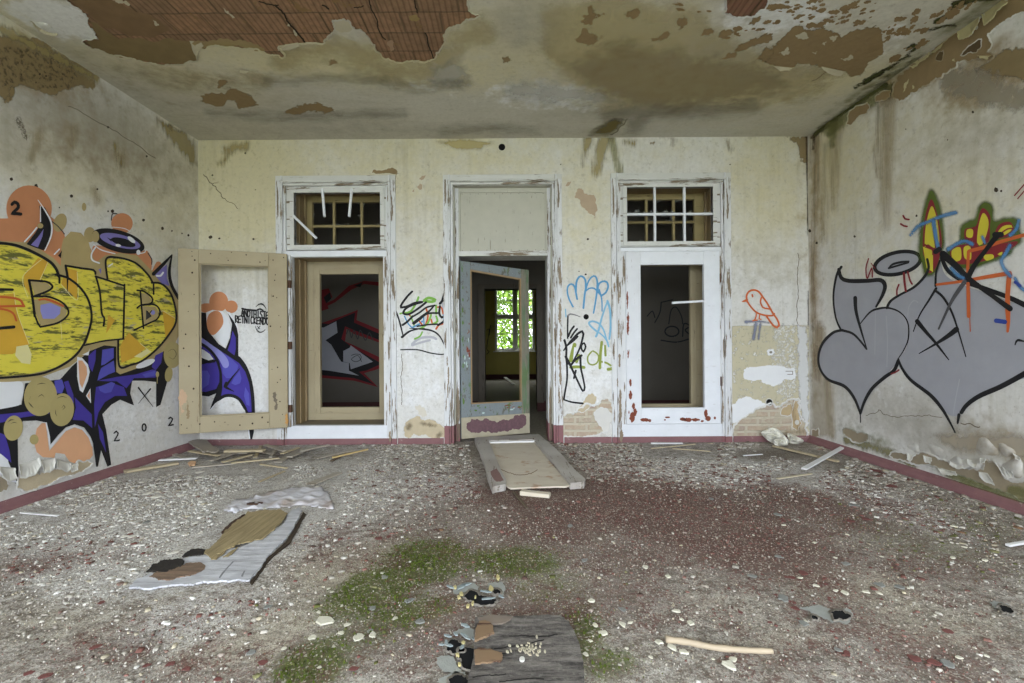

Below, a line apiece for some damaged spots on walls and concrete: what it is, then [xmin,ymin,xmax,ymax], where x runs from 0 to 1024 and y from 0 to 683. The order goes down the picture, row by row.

spalling [66,0,481,67]
leakage [928,0,993,31]
peeling [651,0,1024,126]
peeling [201,80,258,109]
leakage [790,43,921,163]
peeling [565,181,599,219]
peeling [613,282,629,339]
flaking render [554,302,651,443]
flaking render [664,324,820,438]
flaking render [389,404,444,441]
peeling [0,458,94,493]